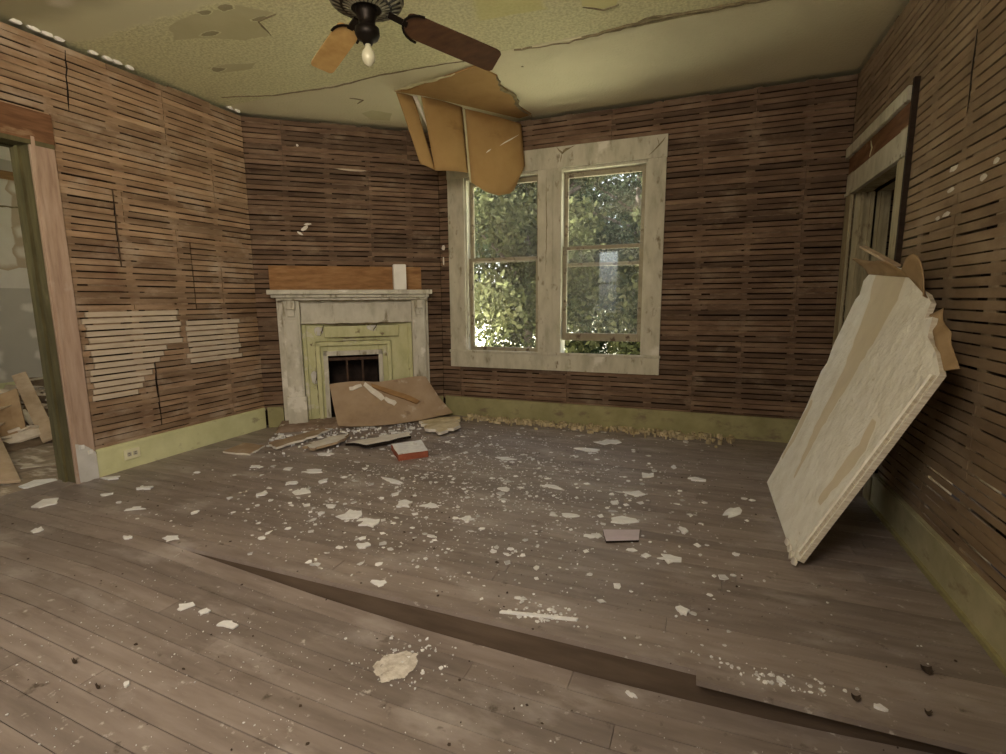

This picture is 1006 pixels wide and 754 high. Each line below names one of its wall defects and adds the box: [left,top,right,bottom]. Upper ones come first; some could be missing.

flaking render [164,3,277,42]
crack [514,0,771,67]
crack [221,61,465,98]
peeling [780,268,909,480]
peeling [815,415,880,508]
spalling [784,538,797,566]